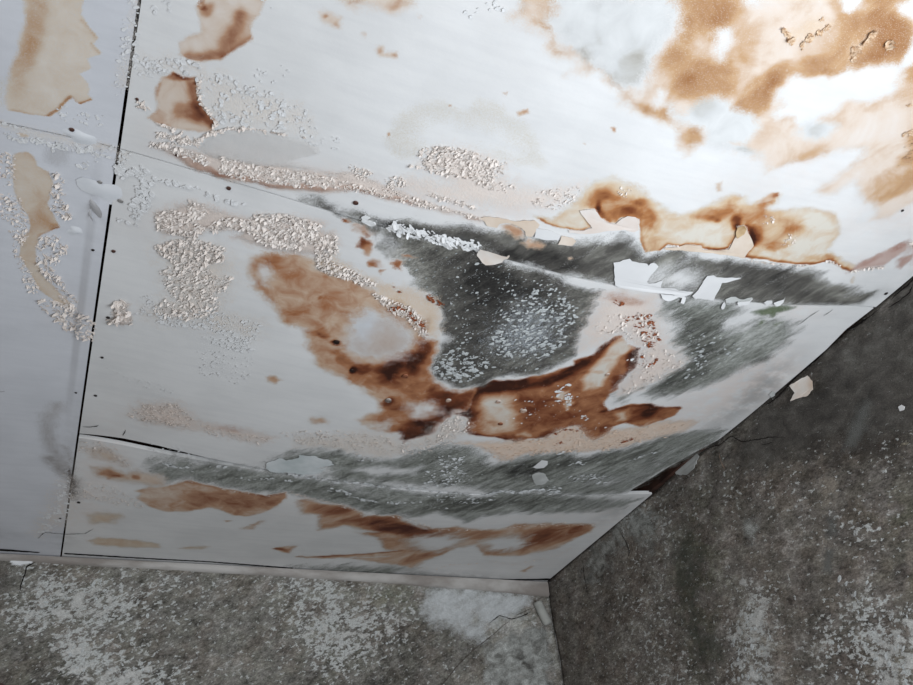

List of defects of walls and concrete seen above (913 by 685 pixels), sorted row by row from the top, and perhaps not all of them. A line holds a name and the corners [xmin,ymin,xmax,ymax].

corrosion [136,70,219,135]
corrosion [177,0,267,63]
peeling [113,145,447,384]
corrosion [318,0,423,31]
corrosion [374,44,400,59]
peeling [149,137,639,246]
peeling [361,215,510,265]
corrosion [243,249,683,443]
leakage [140,191,913,524]
peeling [568,259,753,400]
corrosion [501,0,913,284]
corrosion [75,441,596,573]